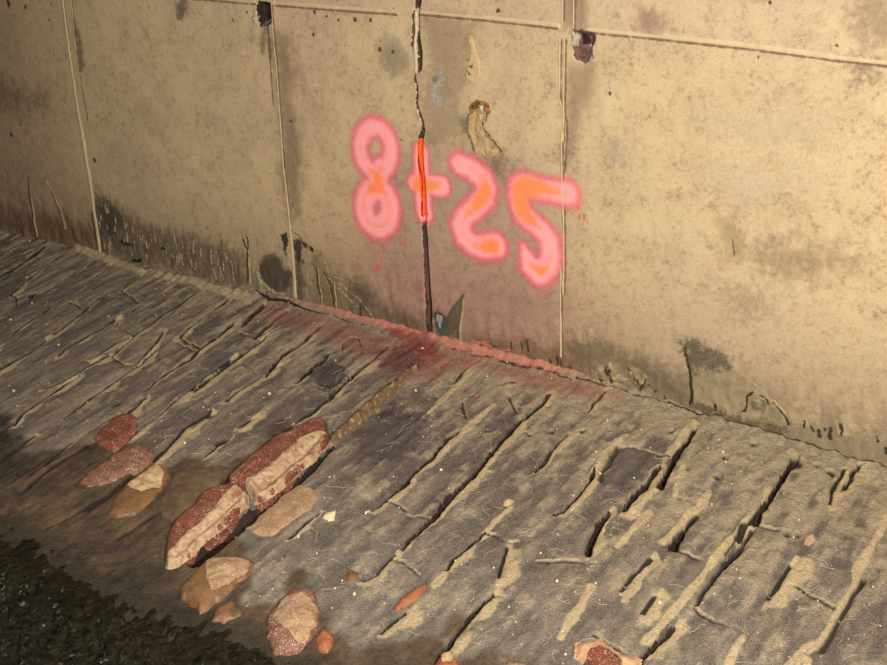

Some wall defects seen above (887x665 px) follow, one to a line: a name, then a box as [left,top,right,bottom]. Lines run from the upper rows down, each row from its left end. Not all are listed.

spalling [246,0,272,50]
spalling [567,0,596,64]
crack [411,0,425,143]
spalling [466,99,503,161]
damp [256,233,314,299]
crack [220,233,365,325]
crack [422,220,433,332]
crack [266,336,312,378]
crack [189,364,415,568]
crack [396,347,886,557]
crack [447,597,494,652]
crack [641,627,675,664]